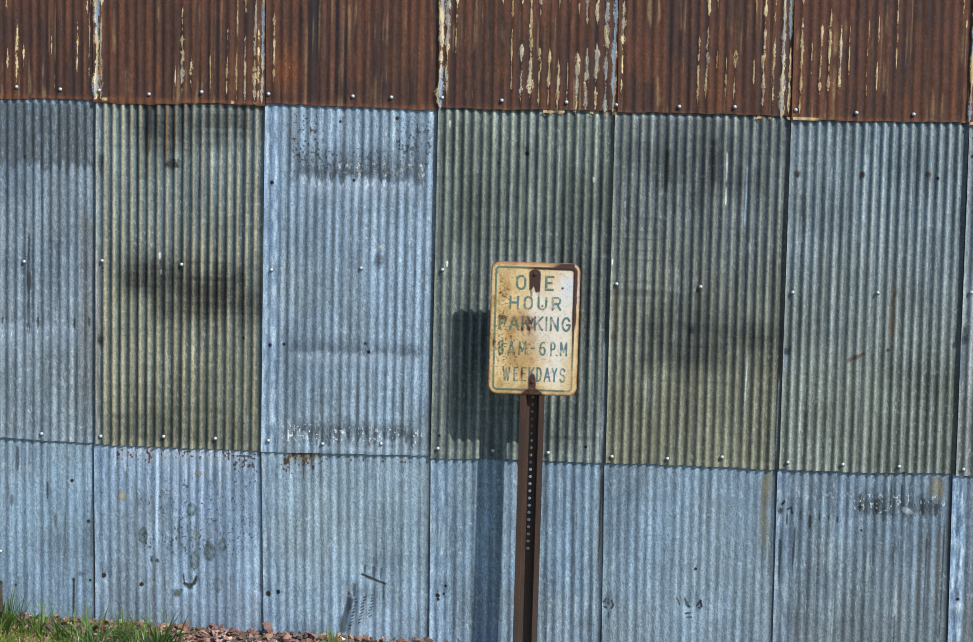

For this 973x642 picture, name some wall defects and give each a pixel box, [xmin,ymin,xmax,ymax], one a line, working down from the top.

peeling [434,0,459,109]
corrosion [0,0,973,147]
peeling [502,0,627,115]
peeling [696,0,738,103]
peeling [752,0,851,121]
damp [0,103,94,175]
damp [126,261,244,322]
corrosion [281,453,364,476]
damp [282,424,423,447]
damp [854,479,945,515]